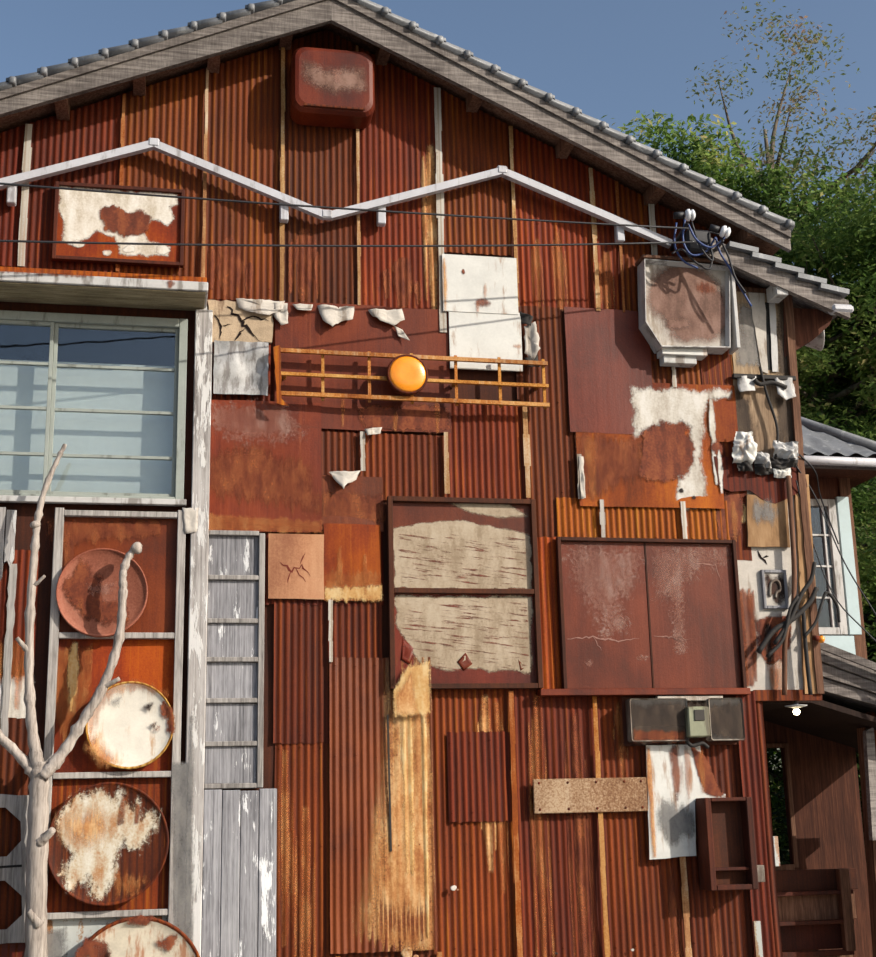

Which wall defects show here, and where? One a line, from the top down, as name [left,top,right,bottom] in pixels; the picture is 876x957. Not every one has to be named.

peeling [59,186,178,257]
crack [215,306,268,342]
peeling [236,298,354,327]
peeling [368,308,409,340]
peeling [631,286,825,701]
rust [47,518,160,626]
crack [280,554,310,583]
peeling [393,503,533,717]
rust [670,746,680,800]
rust [691,748,726,797]
rust [368,689,436,952]
rust [481,821,496,870]